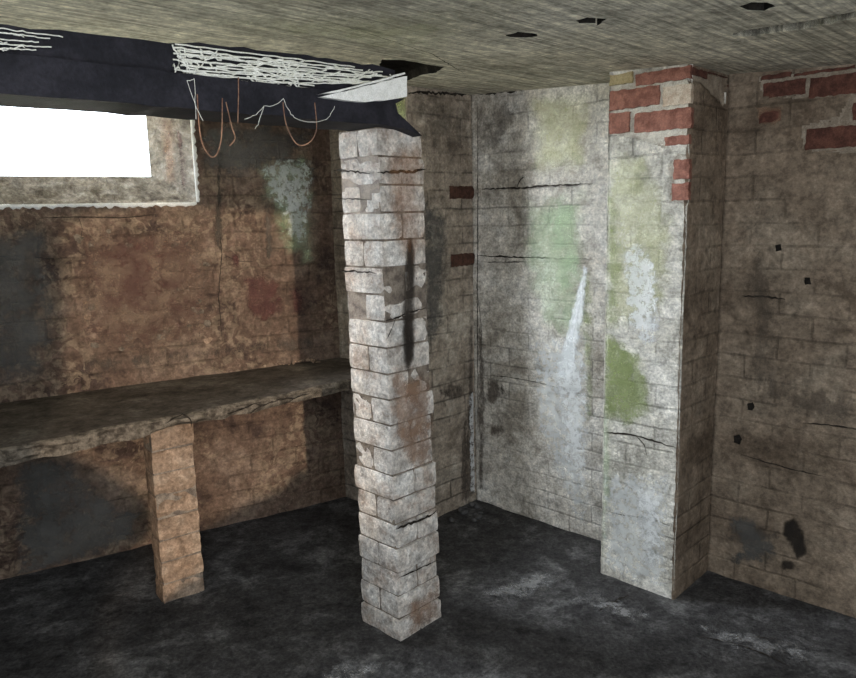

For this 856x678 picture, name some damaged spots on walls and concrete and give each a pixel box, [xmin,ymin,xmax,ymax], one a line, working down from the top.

spalling [608,65,729,204]
spalling [757,65,856,154]
water stain [557,269,591,490]